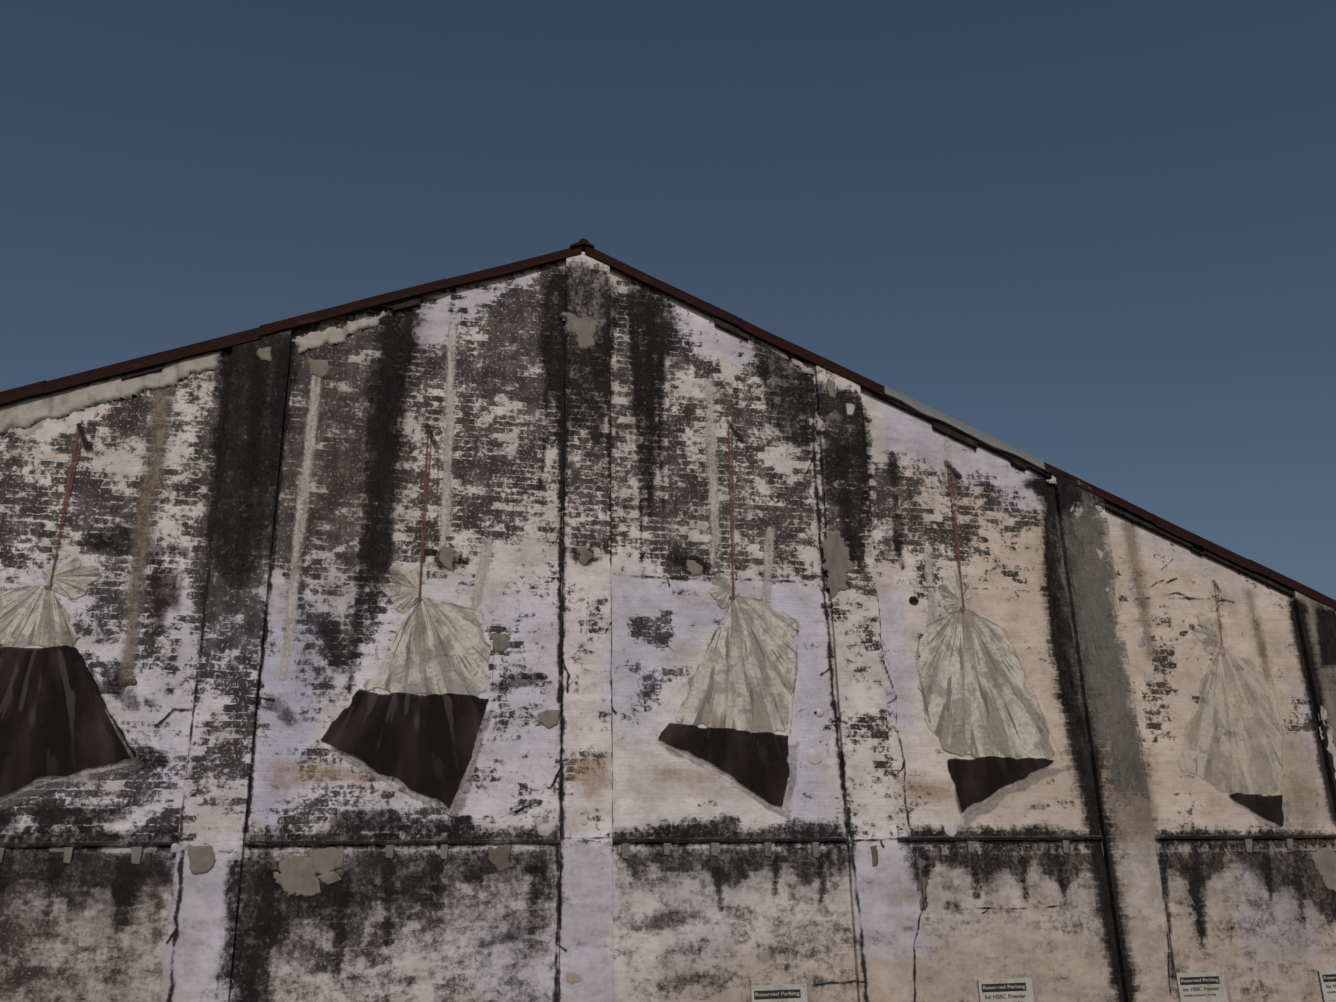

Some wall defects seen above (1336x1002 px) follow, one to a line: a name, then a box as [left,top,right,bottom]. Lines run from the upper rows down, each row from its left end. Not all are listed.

peeling [7,419,54,443]
damp [201,333,321,680]
damp [315,302,424,693]
damp [537,261,680,616]
damp [753,341,872,574]
peeling [816,403,855,432]
damp [888,451,905,569]
damp [903,473,1336,1002]
damp [0,804,182,948]
damp [612,815,853,911]
crack [913,878,925,1002]
crack [957,905,1056,913]